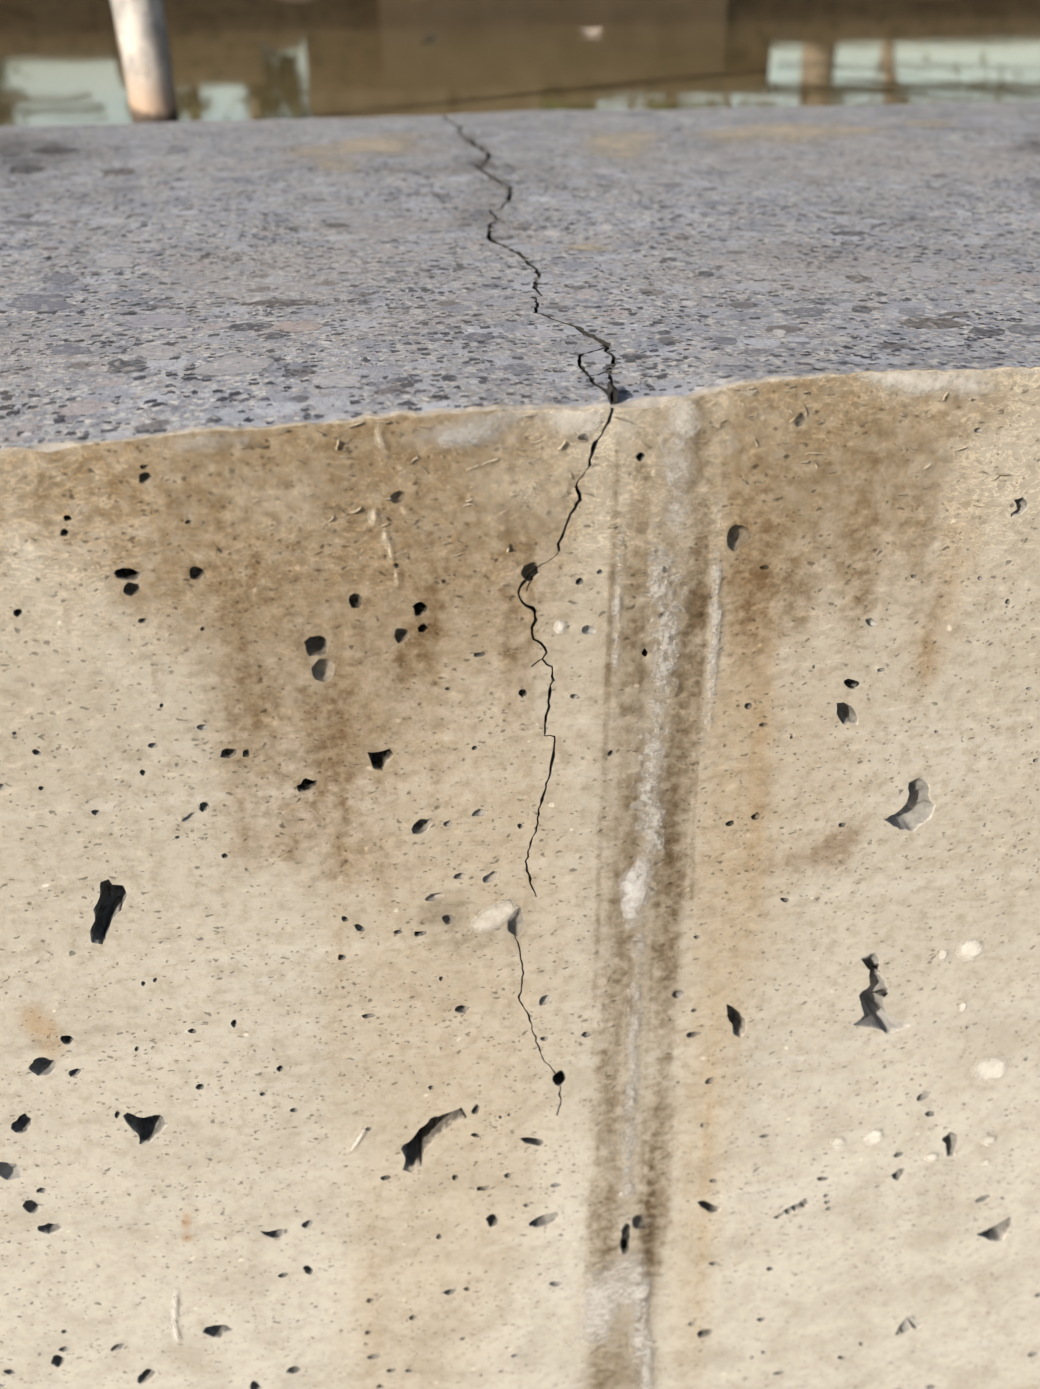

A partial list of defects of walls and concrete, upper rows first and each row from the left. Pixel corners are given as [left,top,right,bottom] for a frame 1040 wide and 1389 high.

leakage [438,414,517,444]
crack [441,115,619,897]
leakage [547,410,601,432]
leakage [663,401,695,531]
leakage [708,552,722,695]
leakage [622,545,677,919]
crack [514,937,562,1115]
leakage [620,986,639,1197]
leakage [583,1262,652,1389]